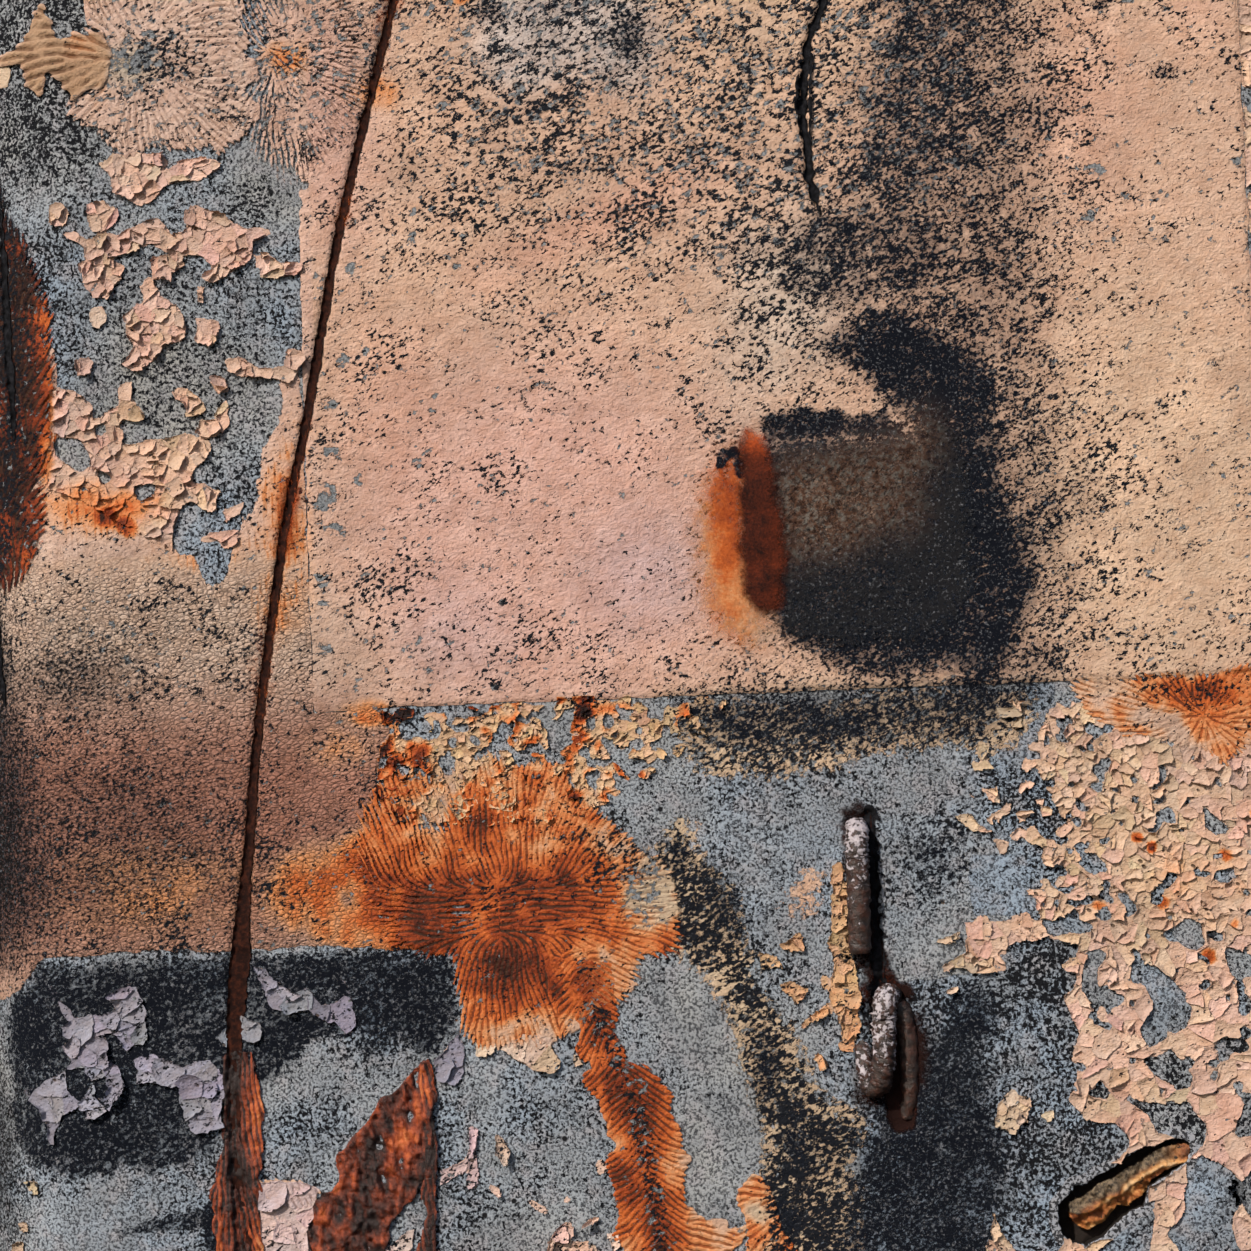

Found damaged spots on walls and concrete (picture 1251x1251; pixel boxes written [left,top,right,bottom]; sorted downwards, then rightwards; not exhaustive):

damp [447,0,656,64]
crack [794,0,827,217]
peeling [46,151,306,551]
damp [660,0,1141,938]
peeling [375,696,707,830]
corrosion [1070,663,1251,767]
peeling [28,986,225,1145]
corrosion [307,1059,438,1251]
corrosion [354,751,797,1251]
damp [742,968,1043,1251]
peeling [801,683,1251,1251]
corrosion [1048,1128,1200,1249]